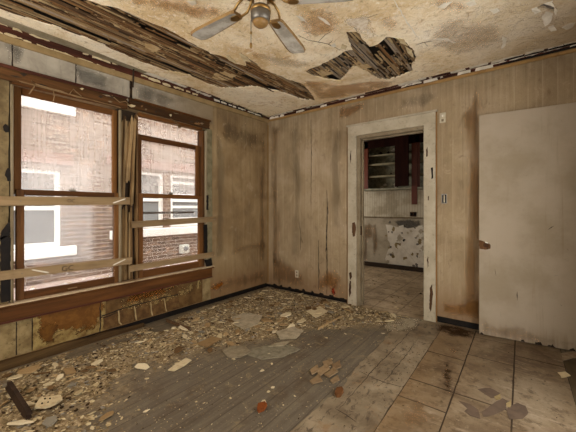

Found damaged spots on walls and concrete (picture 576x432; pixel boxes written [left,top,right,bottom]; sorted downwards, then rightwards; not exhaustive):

peeling [532,1,575,32]
flaking render [0,0,327,119]
flaking render [306,32,415,80]
peeling [398,76,443,88]
peeling [385,221,429,268]